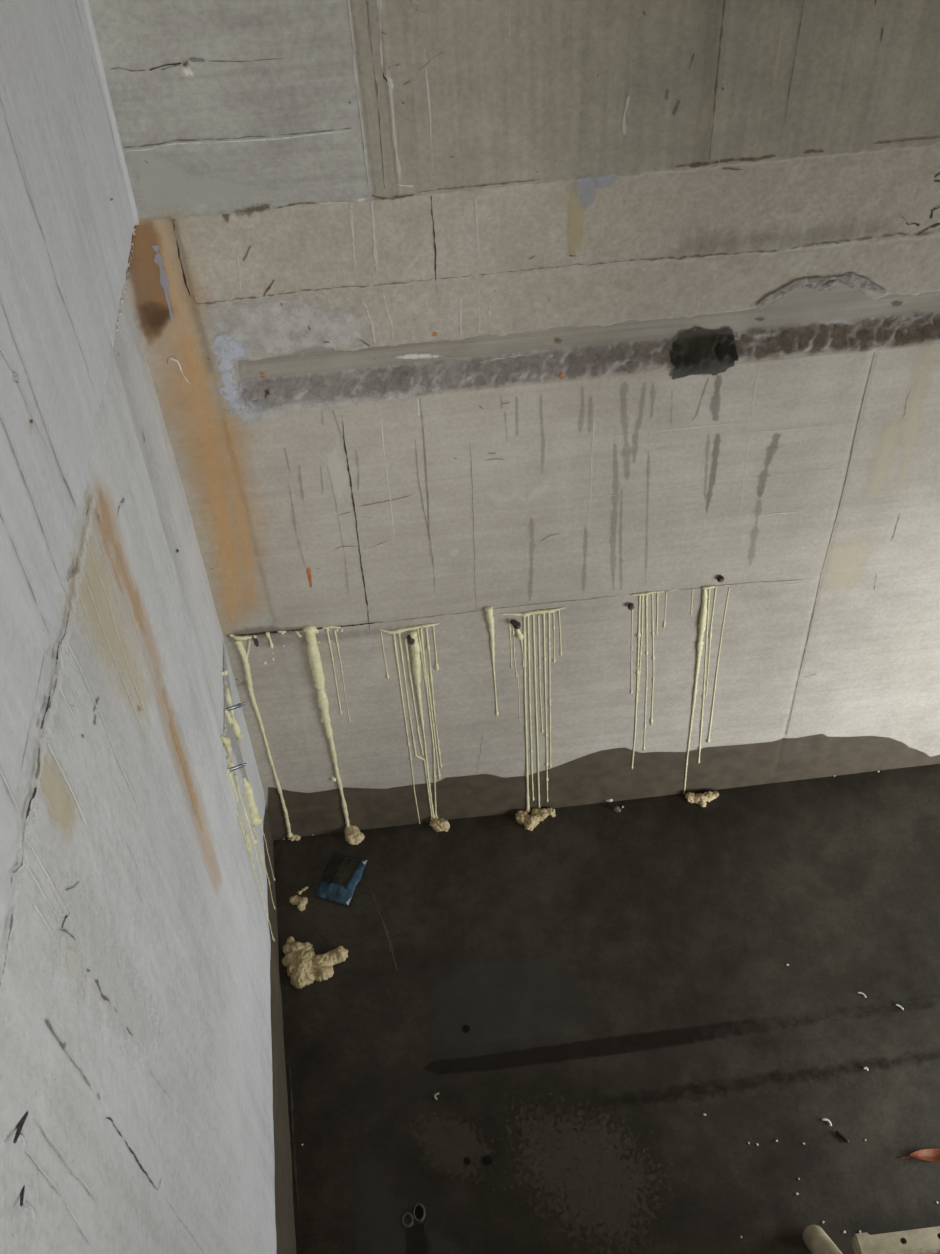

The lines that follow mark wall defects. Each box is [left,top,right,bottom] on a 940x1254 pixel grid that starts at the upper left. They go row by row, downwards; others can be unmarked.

crack [75,0,401,188]
crack [709,0,726,159]
rust [131,225,168,339]
crack [170,196,939,305]
crack [0,293,77,636]